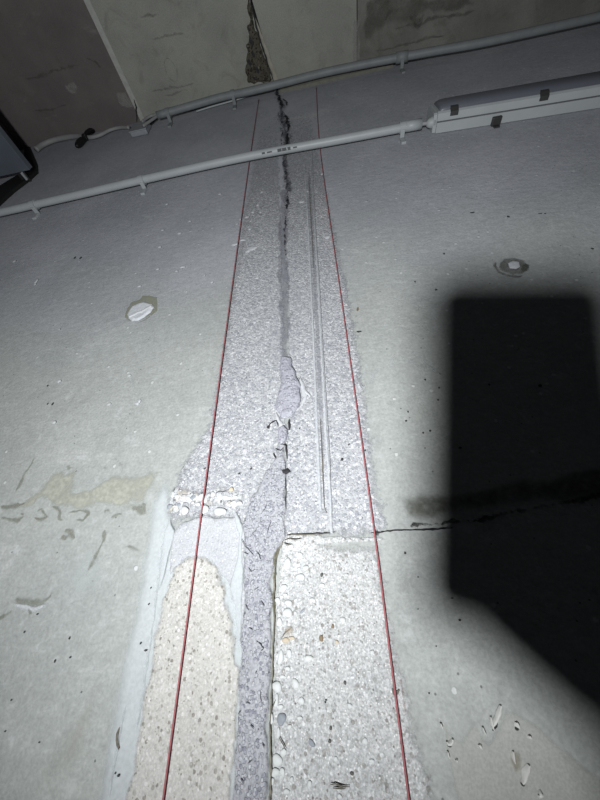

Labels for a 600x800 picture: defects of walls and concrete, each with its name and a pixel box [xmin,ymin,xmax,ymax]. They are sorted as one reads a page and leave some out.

spalling [167,123,431,800]
crack [372,515,496,536]
peeling [446,705,600,800]